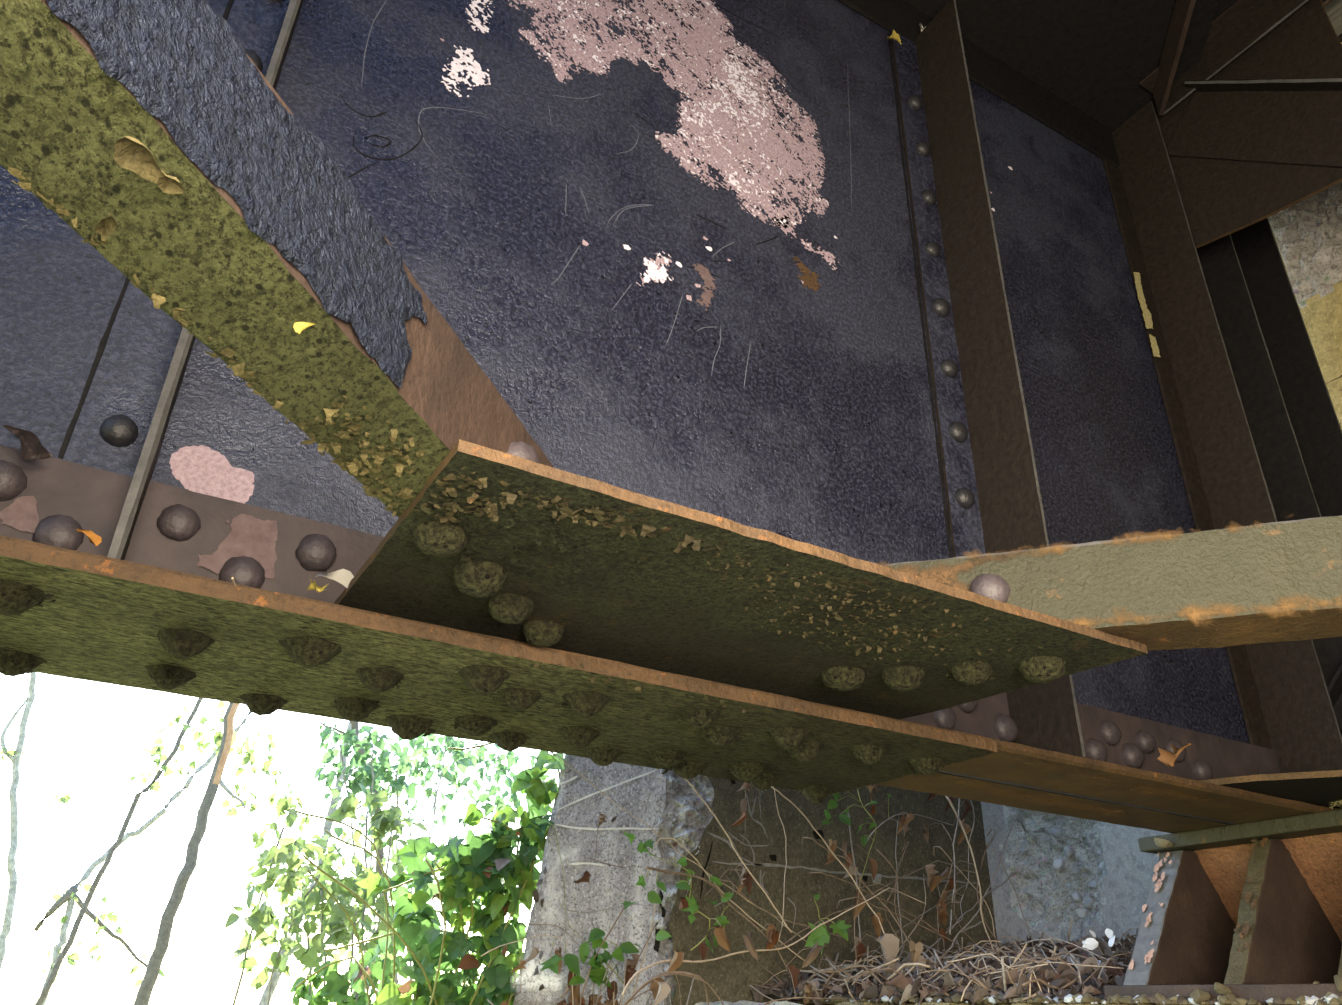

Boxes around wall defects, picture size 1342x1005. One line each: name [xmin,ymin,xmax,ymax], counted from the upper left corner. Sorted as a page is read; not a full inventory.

peeling [440,38,491,97]
peeling [465,0,840,292]
peeling [623,244,717,311]
spalling [1268,182,1342,309]
peeling [169,445,278,579]